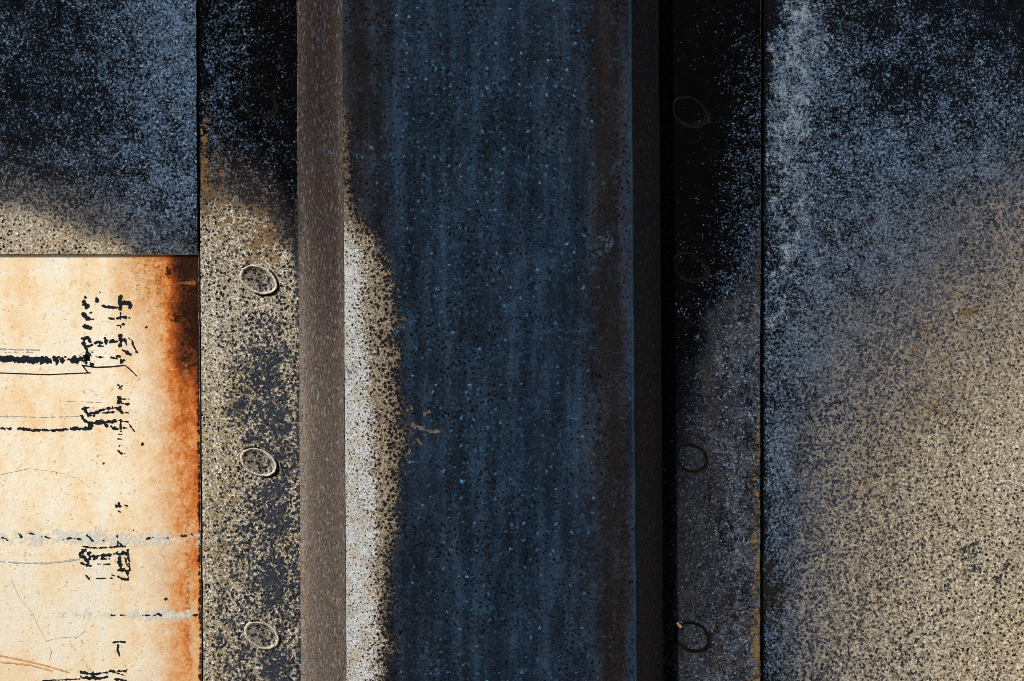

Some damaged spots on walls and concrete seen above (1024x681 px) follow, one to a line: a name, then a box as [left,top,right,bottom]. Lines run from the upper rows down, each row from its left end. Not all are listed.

rust [122,255,201,681]